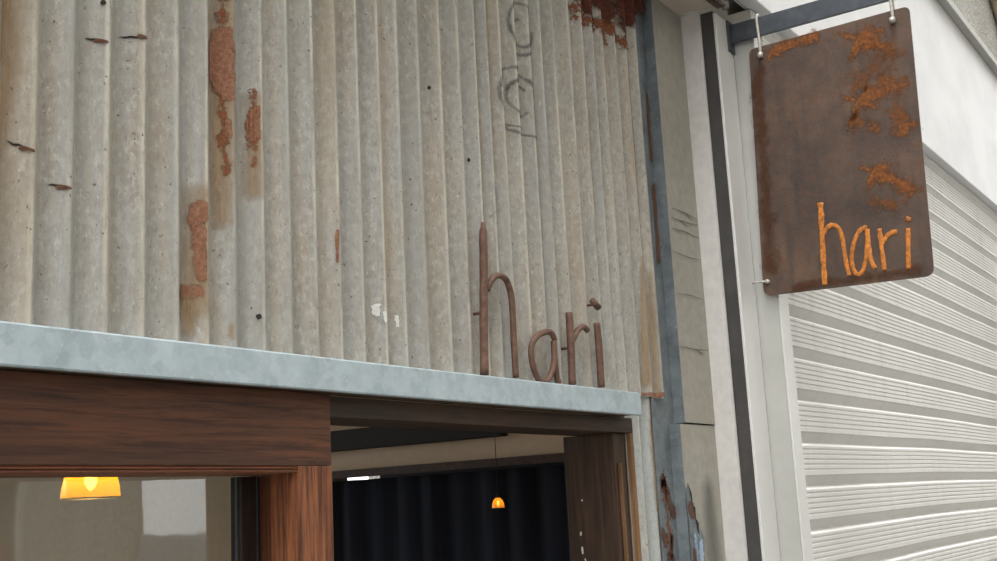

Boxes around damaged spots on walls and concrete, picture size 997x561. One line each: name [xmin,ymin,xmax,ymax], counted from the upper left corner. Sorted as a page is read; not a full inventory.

rust [568,0,645,50]
rust [181,0,236,332]
rust [244,88,261,196]